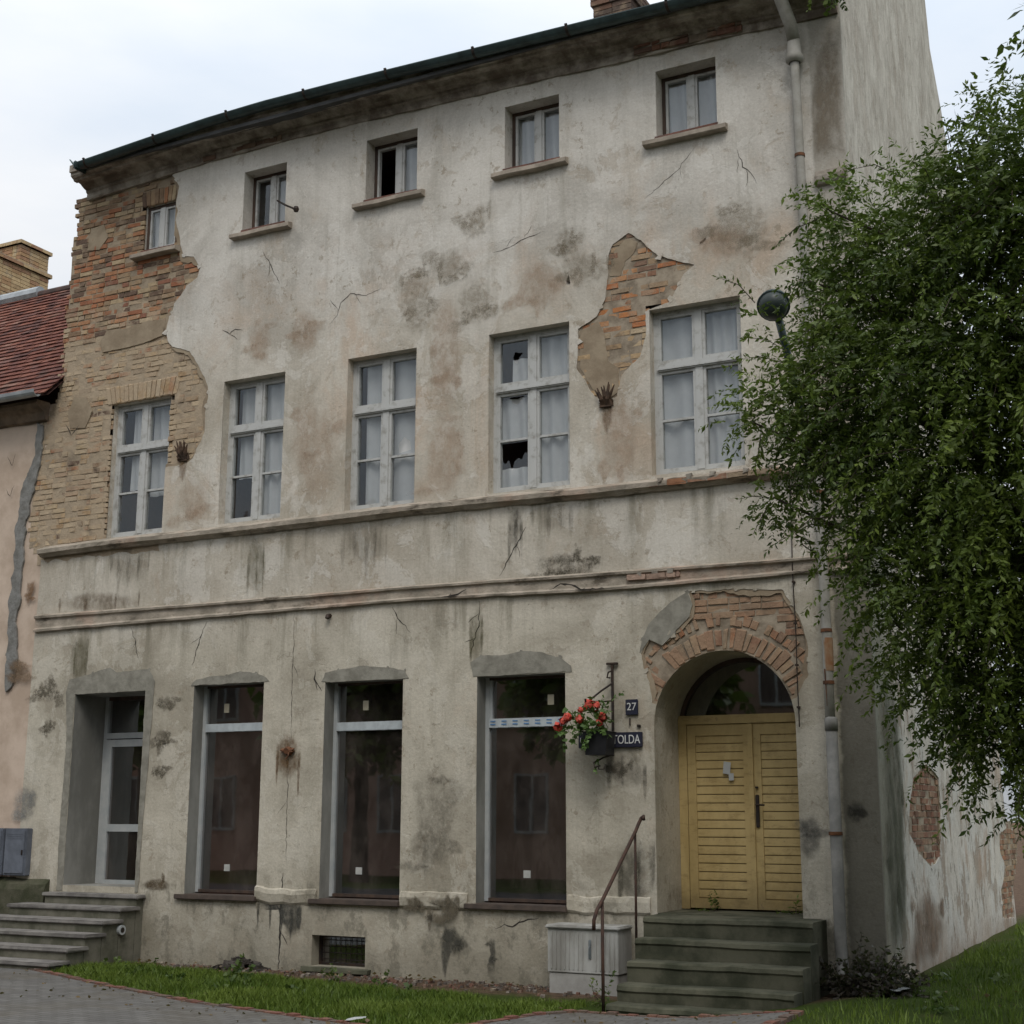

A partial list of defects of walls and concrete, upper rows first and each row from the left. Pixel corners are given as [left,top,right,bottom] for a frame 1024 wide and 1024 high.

spalling [576,233,693,400]
spalling [27,176,209,566]
crack [500,527,526,575]
crack [443,589,480,648]
spalling [641,586,811,704]
rust [276,741,300,774]
spalling [909,764,941,870]
spalling [999,821,1018,919]
crack [278,877,287,969]